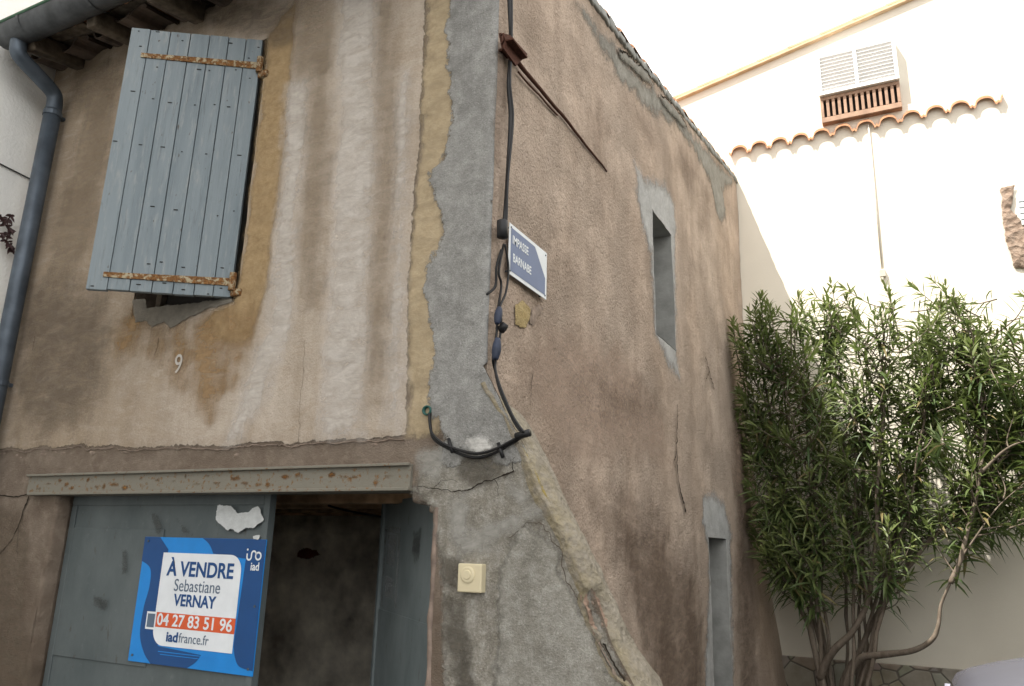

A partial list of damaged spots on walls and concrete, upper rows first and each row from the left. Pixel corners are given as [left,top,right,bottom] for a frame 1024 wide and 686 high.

peeling [582,9,733,221]
peeling [0,0,454,459]
crack [418,457,515,492]
crack [674,405,686,512]
crack [509,522,578,600]
crack [600,642,625,682]